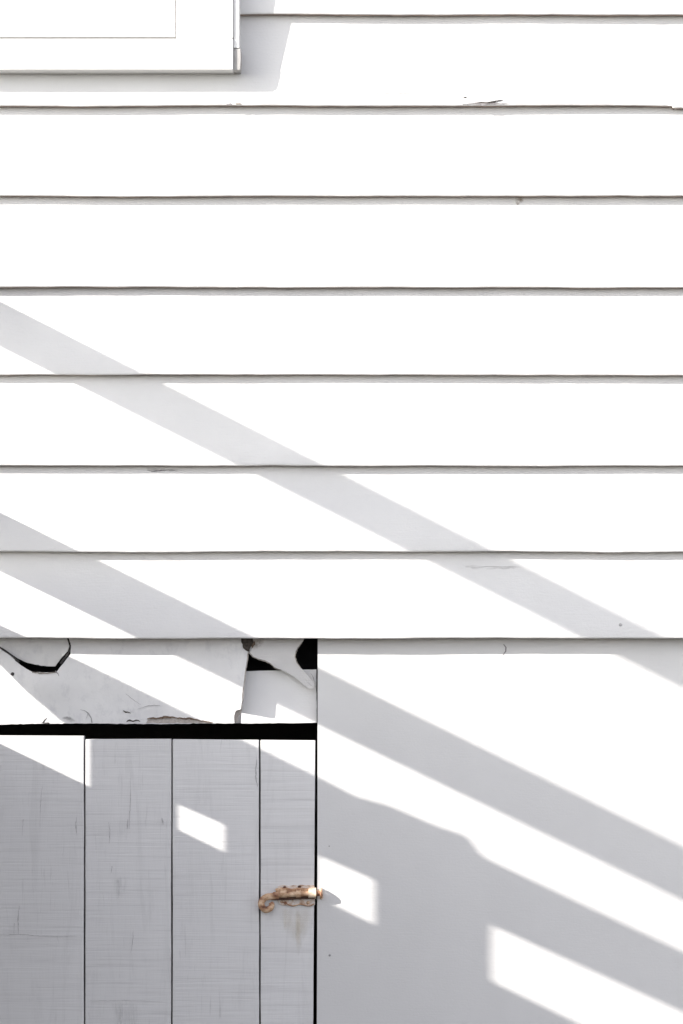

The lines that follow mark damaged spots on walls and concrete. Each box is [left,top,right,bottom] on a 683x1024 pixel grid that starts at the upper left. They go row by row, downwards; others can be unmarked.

spalling [0,638,71,675]
spalling [295,639,317,670]
spalling [234,641,280,723]
rust [274,897,315,907]